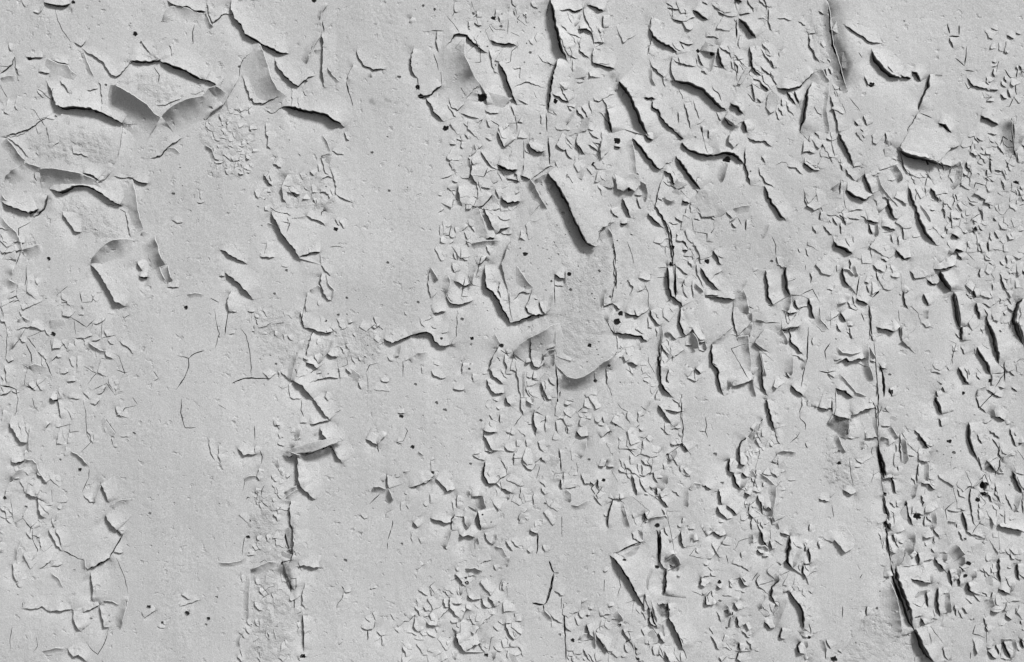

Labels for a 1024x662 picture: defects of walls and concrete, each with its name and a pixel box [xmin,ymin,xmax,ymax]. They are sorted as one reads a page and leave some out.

spalling [0,0,385,661]
spalling [214,0,1024,662]
crack [819,271,1024,662]